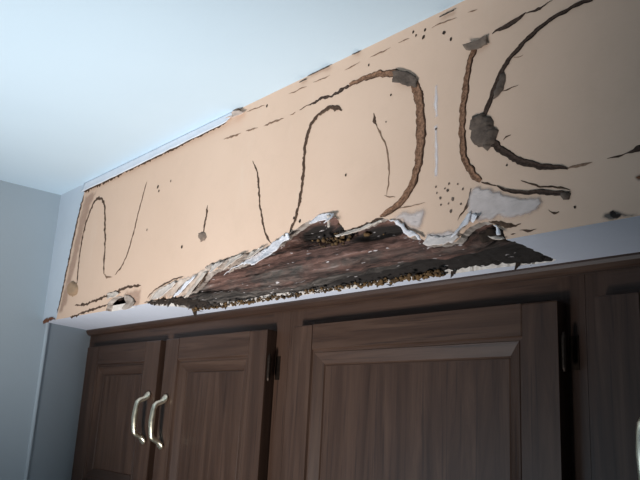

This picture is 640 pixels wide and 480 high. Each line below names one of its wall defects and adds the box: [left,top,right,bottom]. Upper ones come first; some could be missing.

spalling [106,291,135,310]
crack [57,105,264,319]
crack [253,162,271,243]
crack [285,105,342,236]
spalling [144,183,553,319]
crack [372,113,422,229]